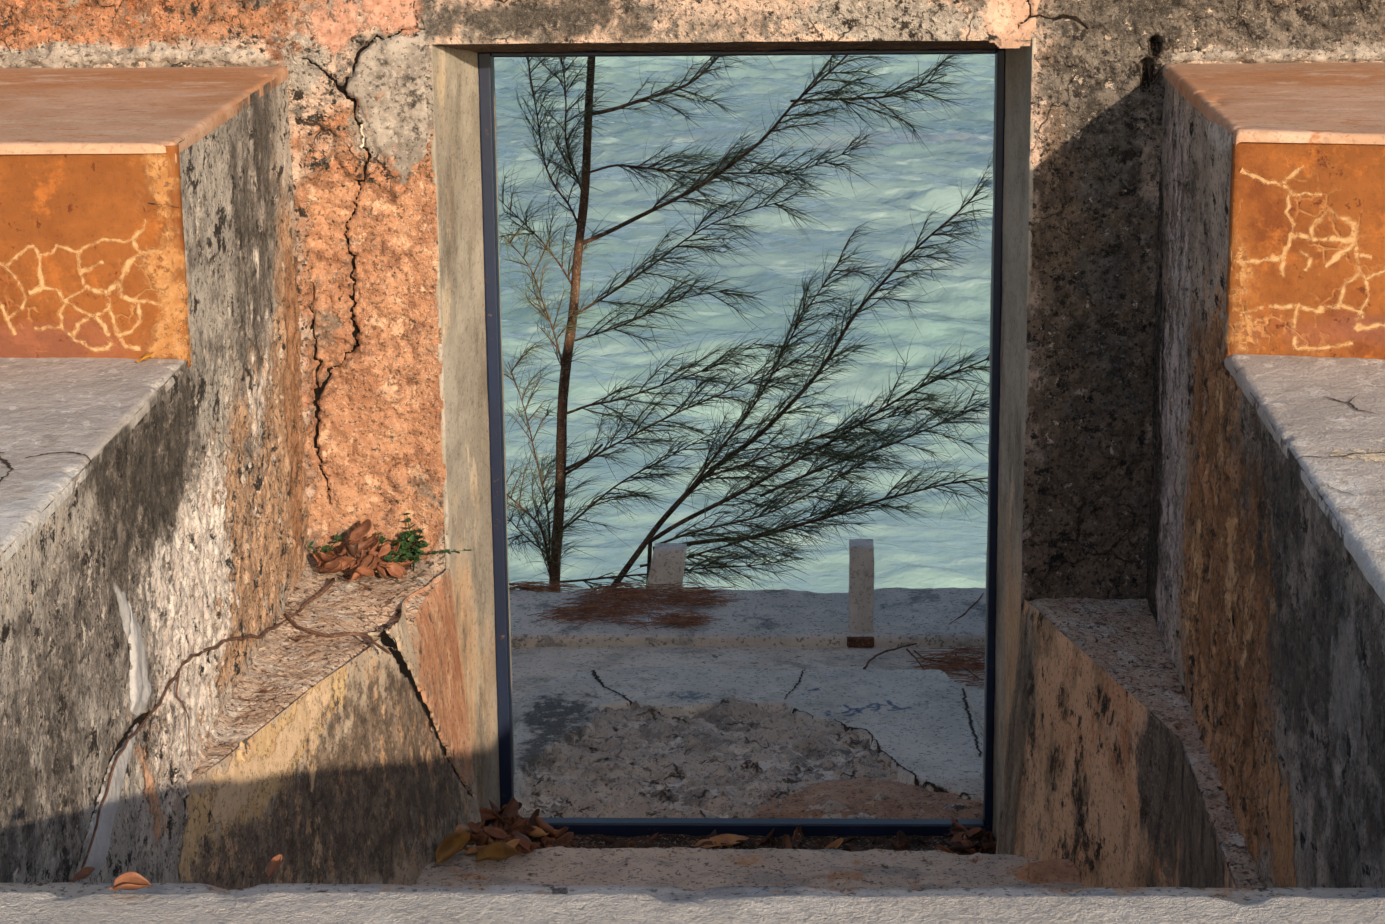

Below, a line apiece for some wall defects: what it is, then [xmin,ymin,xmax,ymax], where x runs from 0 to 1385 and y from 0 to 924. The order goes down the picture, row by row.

crack [1018,0,1089,29]
crack [0,203,179,351]
crack [295,1,425,503]
crack [1237,167,1385,350]
crack [1324,396,1373,413]
crack [0,451,91,482]
crack [1296,452,1385,495]
crack [381,628,473,797]
crack [591,670,632,706]
crack [784,669,975,798]
crack [962,688,982,756]